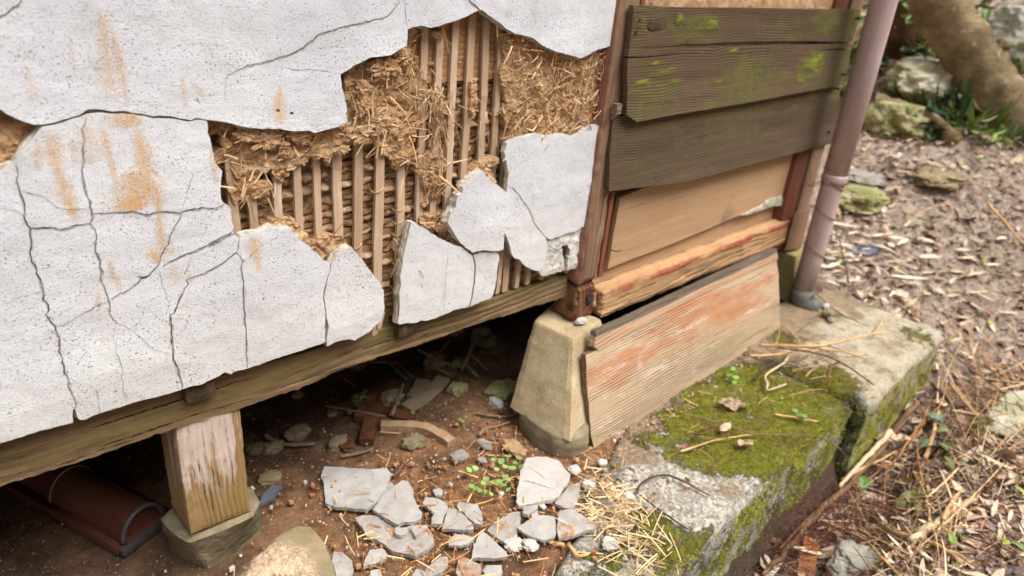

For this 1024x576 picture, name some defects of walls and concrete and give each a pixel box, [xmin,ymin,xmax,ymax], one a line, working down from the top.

crack [0,0,21,17]
crack [225,0,407,99]
spalling [207,24,612,305]
crack [1,109,278,411]
crack [506,185,569,259]